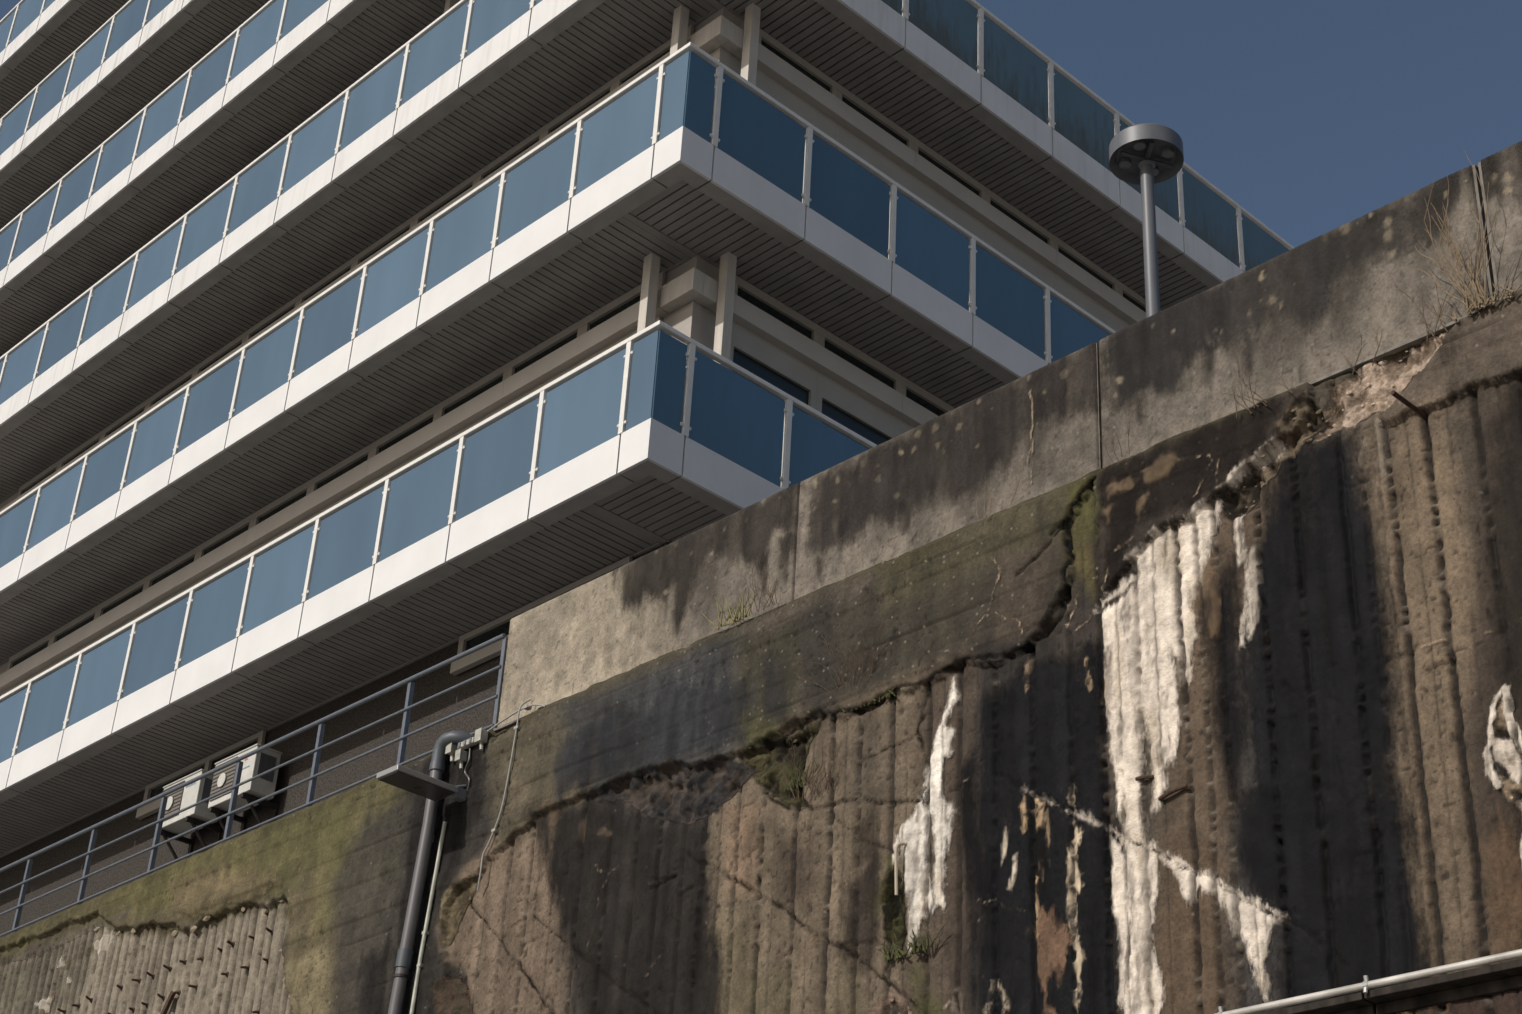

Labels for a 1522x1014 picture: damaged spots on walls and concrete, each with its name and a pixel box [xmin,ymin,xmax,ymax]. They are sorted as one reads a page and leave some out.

damp [1481,140,1522,199]
damp [1278,209,1407,322]
damp [812,270,1264,551]
spalling [1221,332,1447,521]
damp [613,483,800,630]
crack [784,477,1116,758]
damp [525,676,753,1014]
crack [838,786,927,848]
damp [844,400,1431,1014]
spalling [1494,699,1522,813]
crack [470,900,636,1013]
crack [650,853,915,1004]